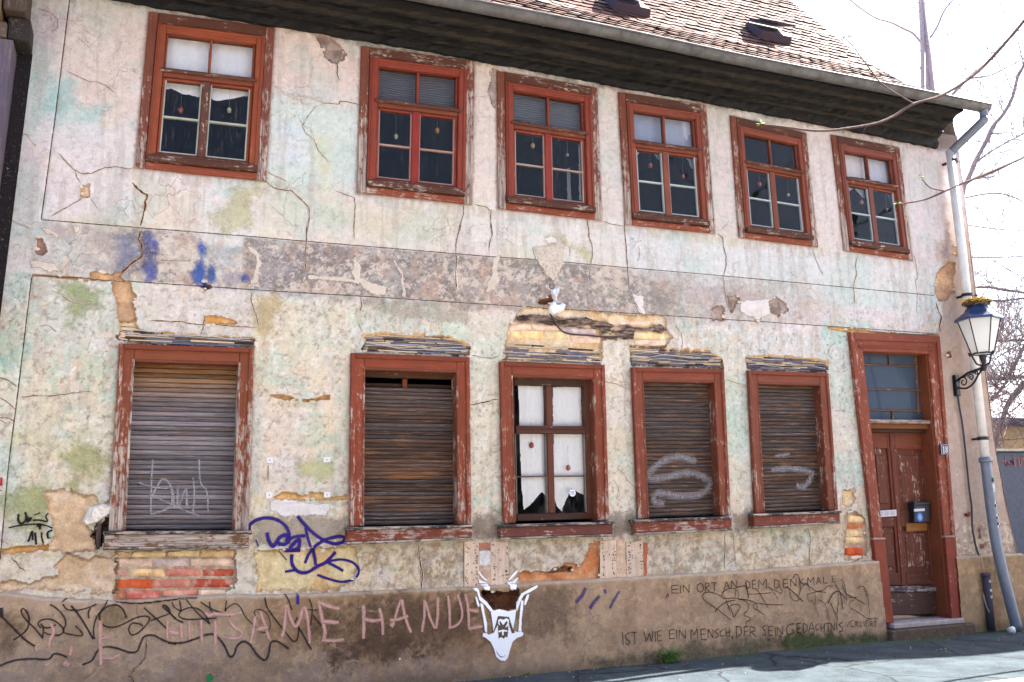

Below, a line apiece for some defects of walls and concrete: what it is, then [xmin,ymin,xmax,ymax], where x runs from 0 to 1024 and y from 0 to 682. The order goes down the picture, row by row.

flaking render [316,34,347,65]
crack [302,47,359,160]
crack [12,133,191,273]
flaking render [30,227,255,348]
crack [266,171,310,270]
crack [336,191,356,238]
crack [455,204,493,297]
flaking render [502,294,724,369]
flaking render [711,295,789,322]
flaking render [0,488,238,601]
flaking render [481,540,602,611]
flaking render [842,487,868,562]